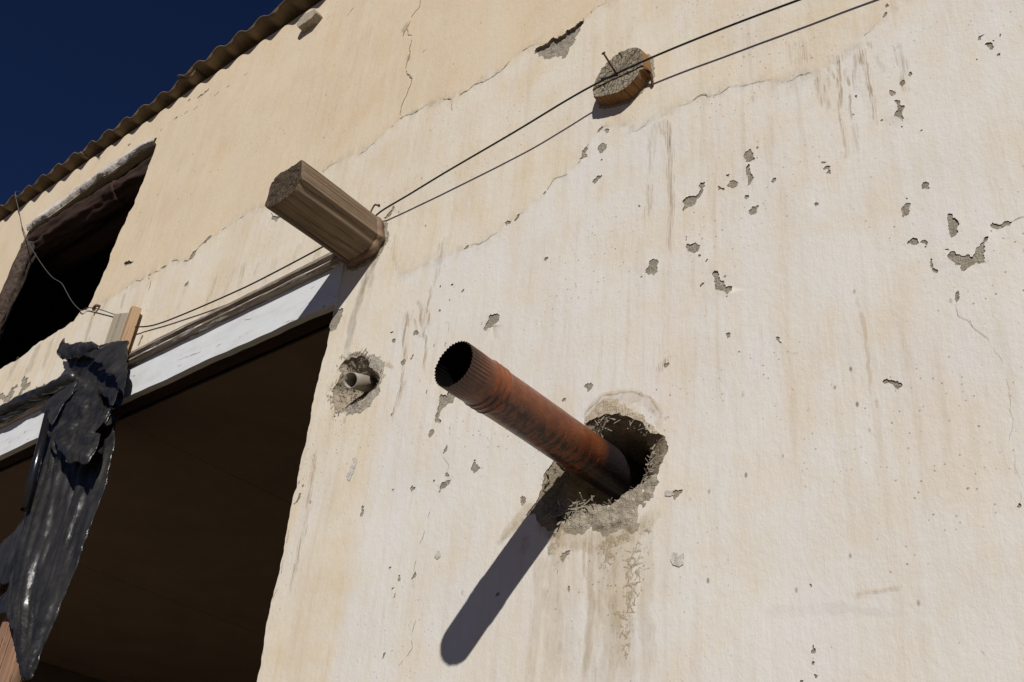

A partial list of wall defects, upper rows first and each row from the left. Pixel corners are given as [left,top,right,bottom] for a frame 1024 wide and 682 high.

crack [400,0,534,119]
spalling [537,25,582,59]
peeling [881,72,912,128]
peeling [683,182,705,211]
peeling [646,259,659,275]
peeling [686,239,732,297]
peeling [946,214,1012,271]
peeling [484,314,499,331]
spalling [327,348,386,416]
spalling [521,398,668,659]